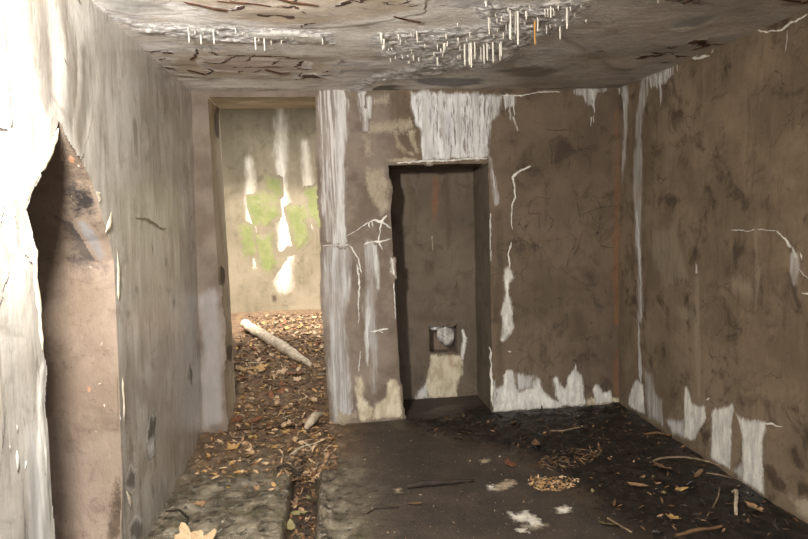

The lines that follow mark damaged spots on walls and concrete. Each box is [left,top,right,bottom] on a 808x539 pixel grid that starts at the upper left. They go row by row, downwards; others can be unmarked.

water stain [18,0,93,159]
water stain [94,0,345,48]
water stain [242,153,259,233]
water stain [260,0,808,524]
water stain [198,284,229,432]
water stain [103,474,121,539]